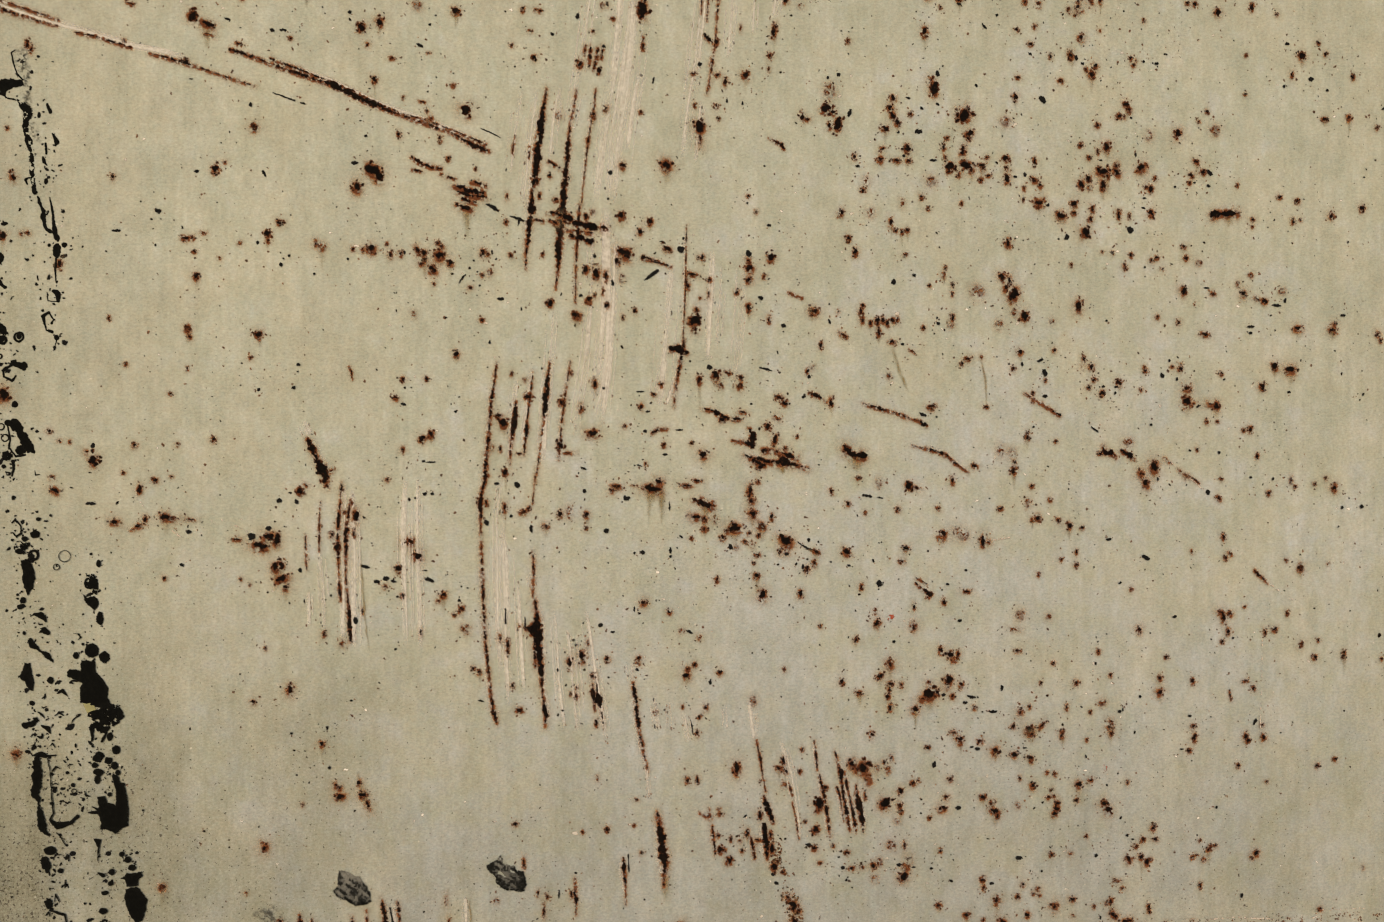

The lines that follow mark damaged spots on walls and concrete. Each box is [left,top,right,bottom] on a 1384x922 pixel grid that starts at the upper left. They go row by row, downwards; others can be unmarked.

rust [349,8,402,61]
rust [662,0,810,157]
rust [795,81,845,136]
peeling [0,55,67,302]
rust [218,214,291,285]
peeling [1,401,39,477]
rust [47,429,102,473]
peeling [14,514,52,609]
peeling [83,560,104,625]
rust [1209,570,1347,661]
peeling [18,631,147,922]
rust [679,626,1172,922]